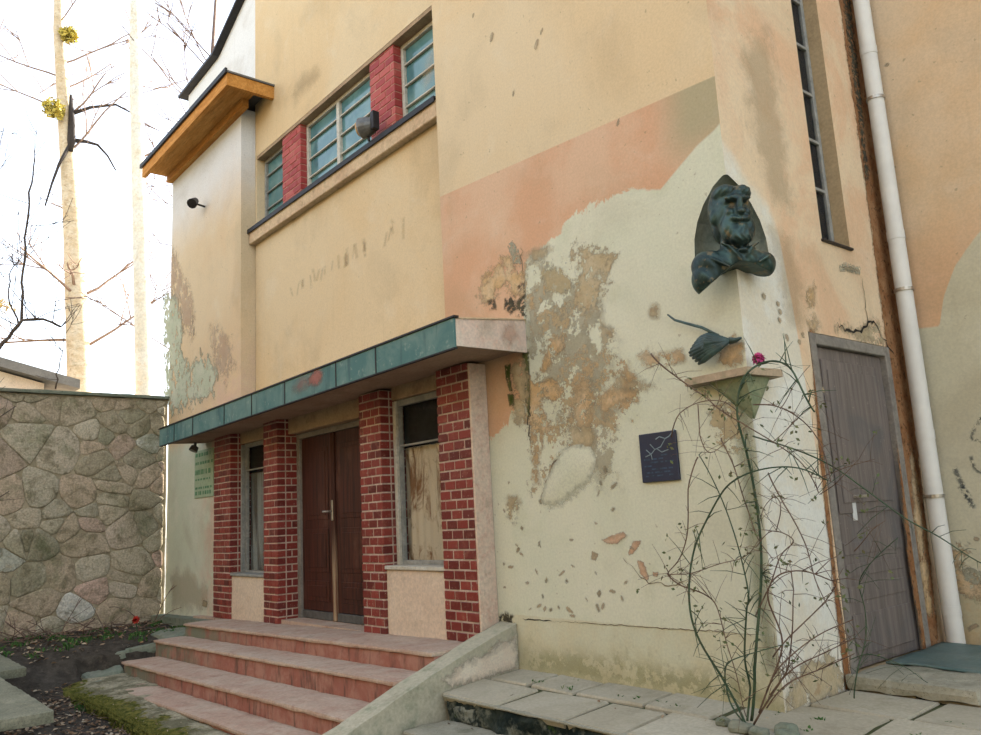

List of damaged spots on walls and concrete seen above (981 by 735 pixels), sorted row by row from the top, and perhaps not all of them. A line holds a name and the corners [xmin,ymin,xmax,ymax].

peeling [162,256,232,417]
peeling [476,242,649,495]
peeling [638,349,684,366]
peeling [719,335,744,367]
crack [837,281,894,354]
peeling [503,496,518,519]
peeling [952,544,981,601]